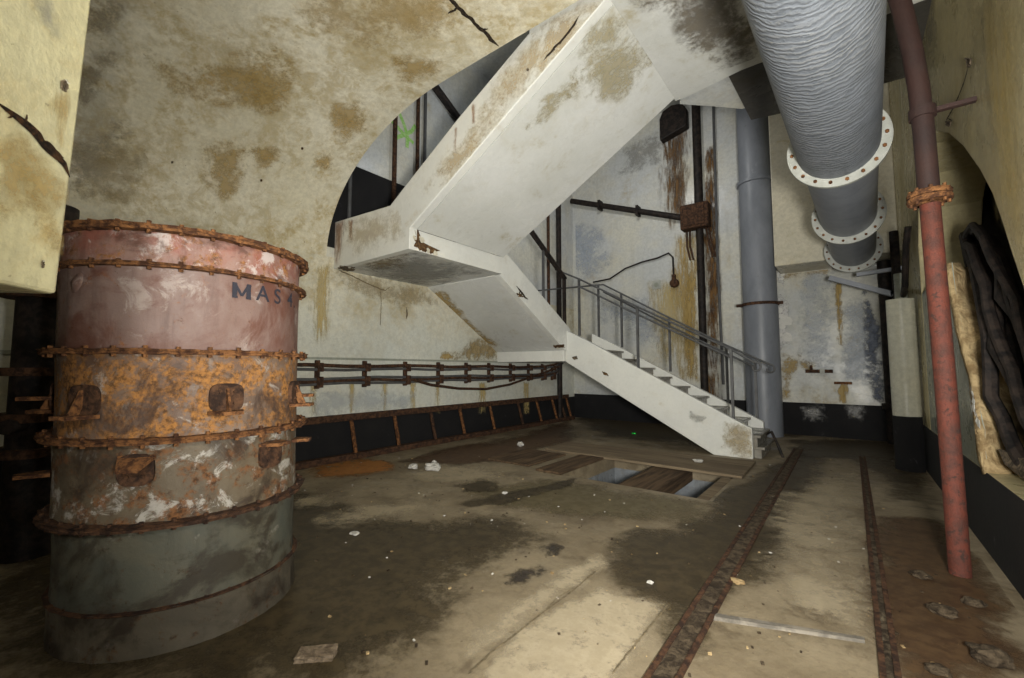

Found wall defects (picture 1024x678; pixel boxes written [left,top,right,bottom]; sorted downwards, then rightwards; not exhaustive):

crack [448,0,499,46]
crack [544,16,579,60]
damp [646,0,754,60]
crack [0,104,70,177]
rust [664,132,692,226]
spalling [413,230,440,256]
rust [653,147,721,396]
rust [835,283,843,344]
damp [864,302,884,402]
rust [838,384,848,403]
damp [0,440,926,678]
damp [863,517,1024,678]